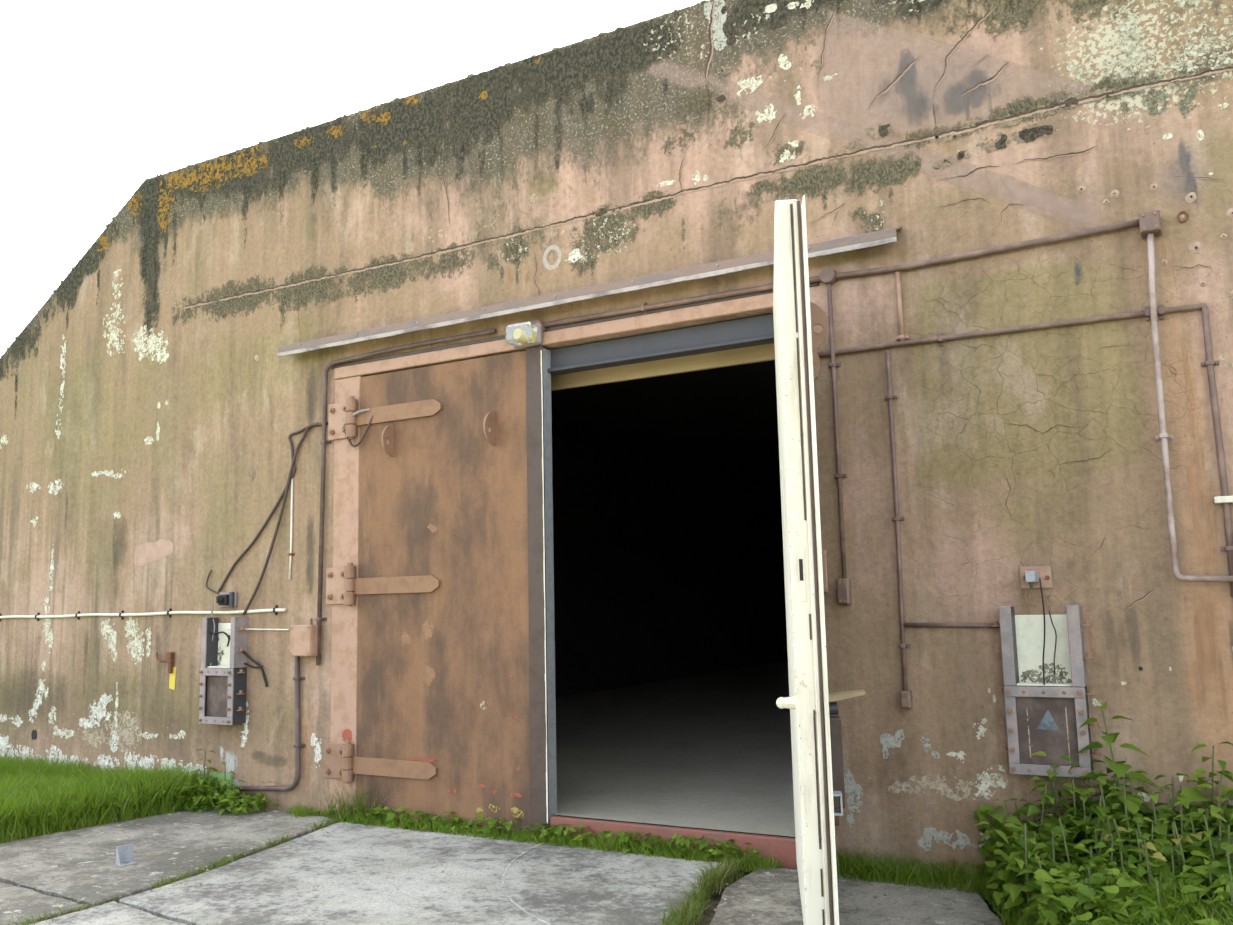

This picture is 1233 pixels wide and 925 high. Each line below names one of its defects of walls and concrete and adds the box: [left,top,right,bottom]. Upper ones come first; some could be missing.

peeling [778,54,791,70]
leakage [899,54,927,119]
leakage [945,72,986,113]
leakage [310,157,337,206]
leakage [554,96,562,169]
crack [185,1,1233,338]
peeling [779,140,799,163]
leakage [139,180,177,335]
peeling [103,269,169,364]
crack [1006,420,1111,488]
peeling [0,544,208,777]
peeling [888,764,1008,801]